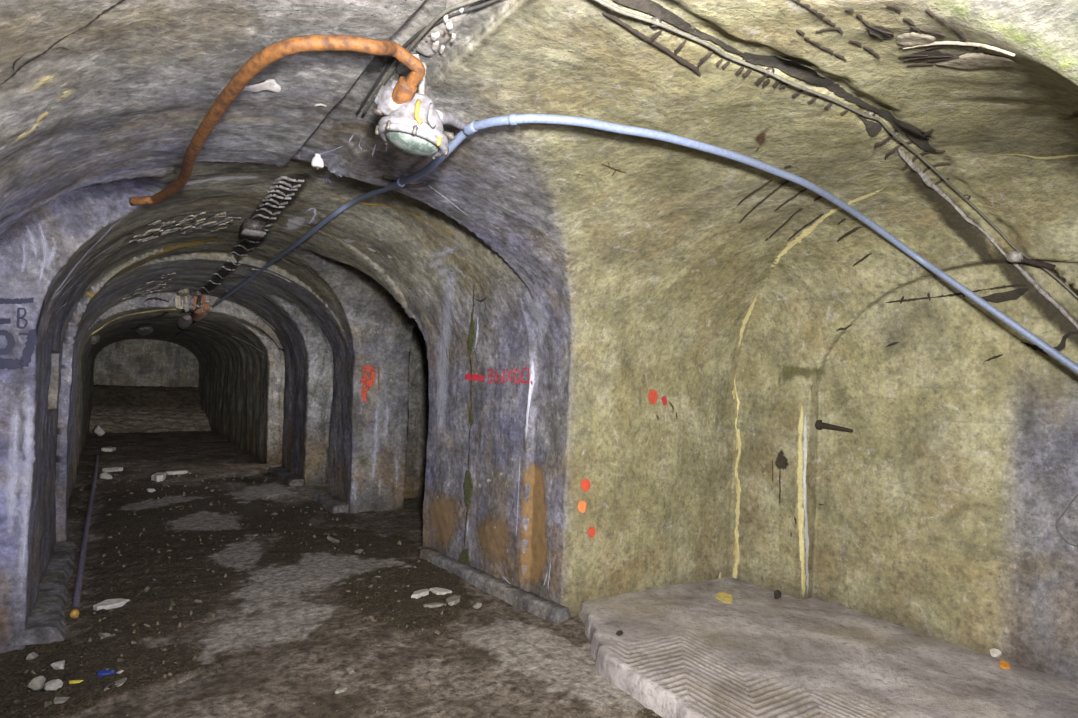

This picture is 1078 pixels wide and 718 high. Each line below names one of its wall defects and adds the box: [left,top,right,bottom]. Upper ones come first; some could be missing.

crack [0,0,125,85]
rust [478,520,508,560]
rust [520,464,548,582]